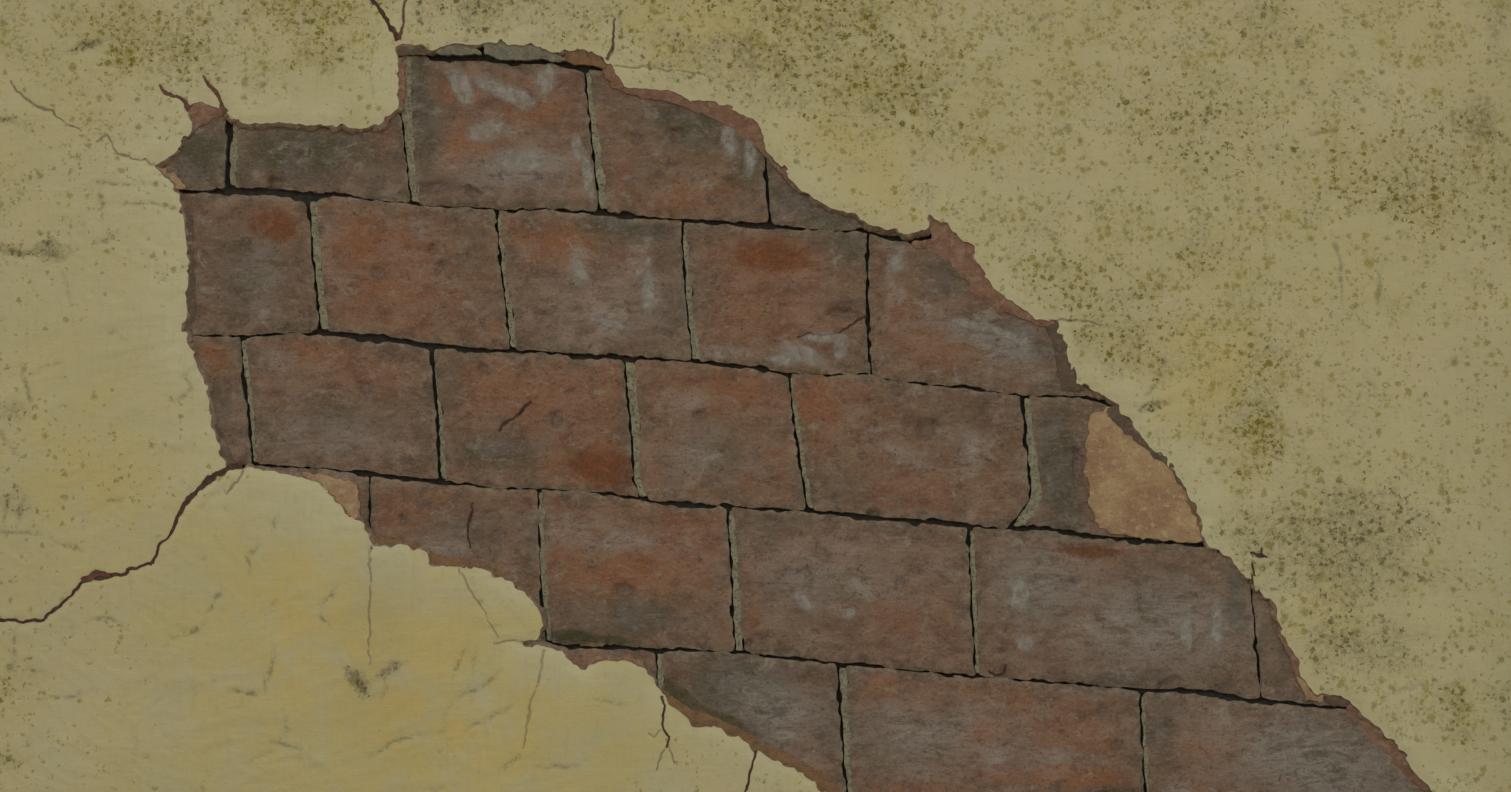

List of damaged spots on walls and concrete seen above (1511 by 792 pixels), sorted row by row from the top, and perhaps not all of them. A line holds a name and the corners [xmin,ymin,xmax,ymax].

crack [370,0,407,41]
flaking render [156,41,1429,792]
crack [0,462,243,624]